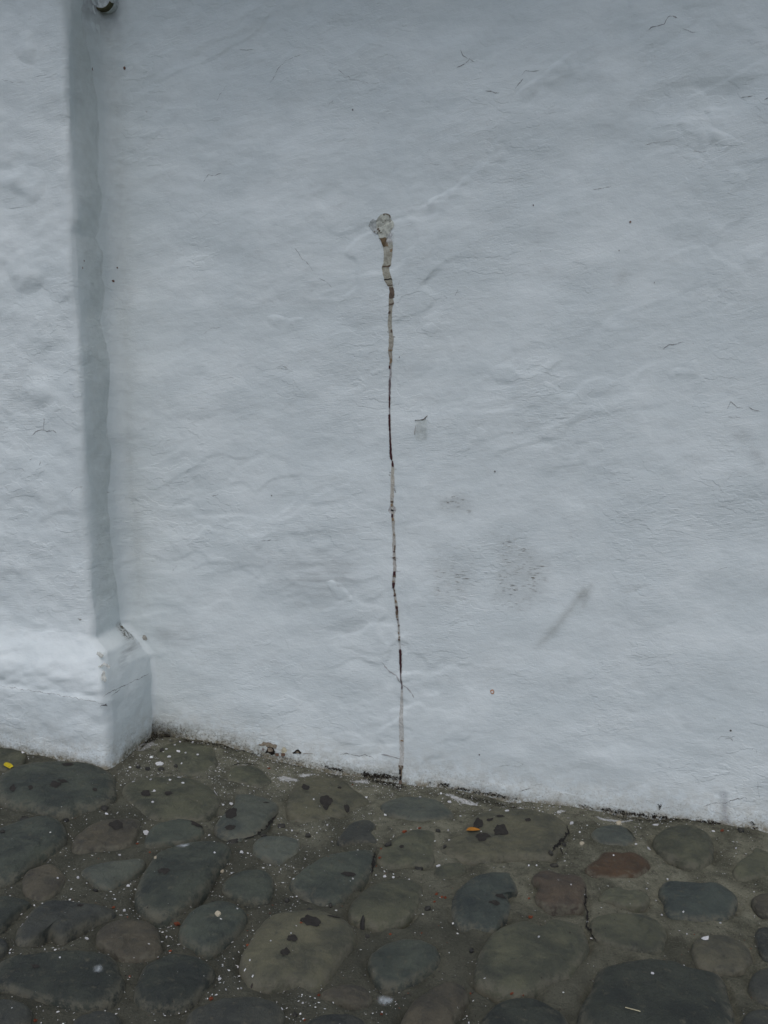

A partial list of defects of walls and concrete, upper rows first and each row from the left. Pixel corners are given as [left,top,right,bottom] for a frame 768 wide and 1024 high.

crack [340,238,414,784]